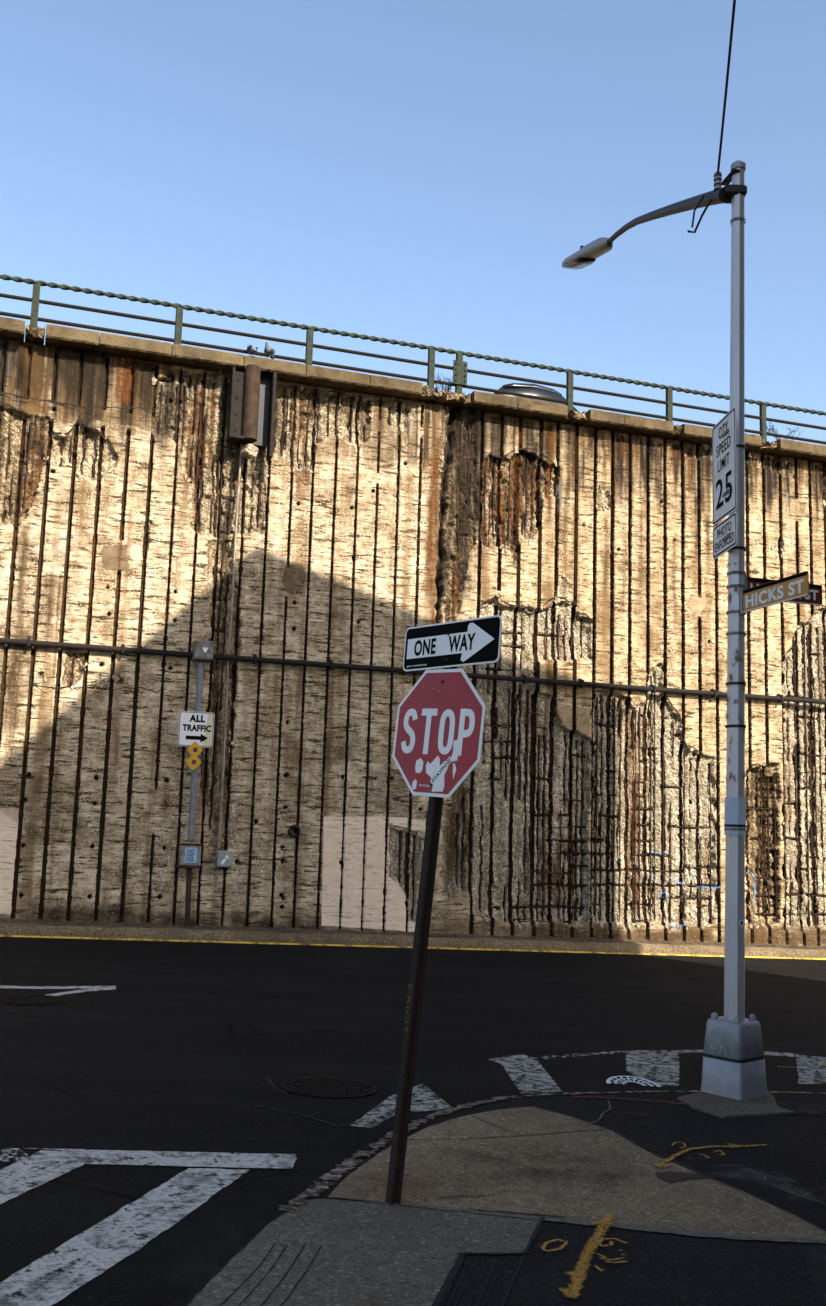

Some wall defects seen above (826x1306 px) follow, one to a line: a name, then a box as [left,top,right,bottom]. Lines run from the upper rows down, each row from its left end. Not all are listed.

water stain [32,417,44,459]
water stain [0,339,229,441]
water stain [285,389,430,453]
corrosion [427,440,440,576]
corrosion [473,426,553,543]
spalling [439,573,717,932]
spalling [745,608,826,933]
spalling [388,822,423,922]